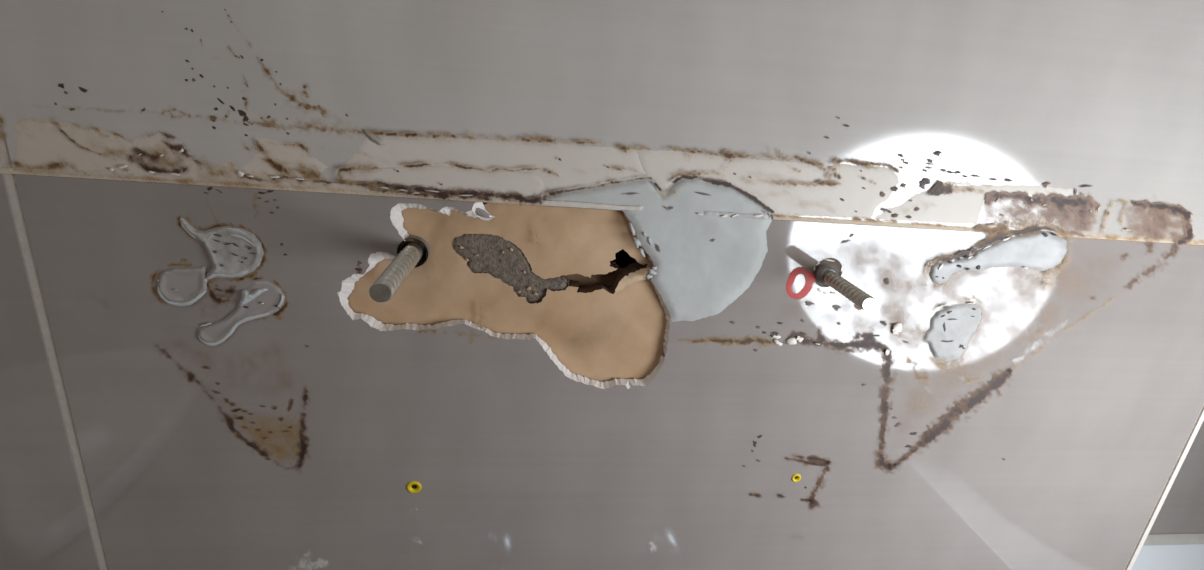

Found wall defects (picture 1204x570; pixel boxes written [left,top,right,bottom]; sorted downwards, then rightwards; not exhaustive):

peeling [255,137,328,180]
water stain [357,130,556,143]
water stain [667,148,959,243]
water stain [921,151,1203,289]
spalling [337,187,671,389]
water stain [1012,267,1079,298]
water stain [688,258,1051,473]